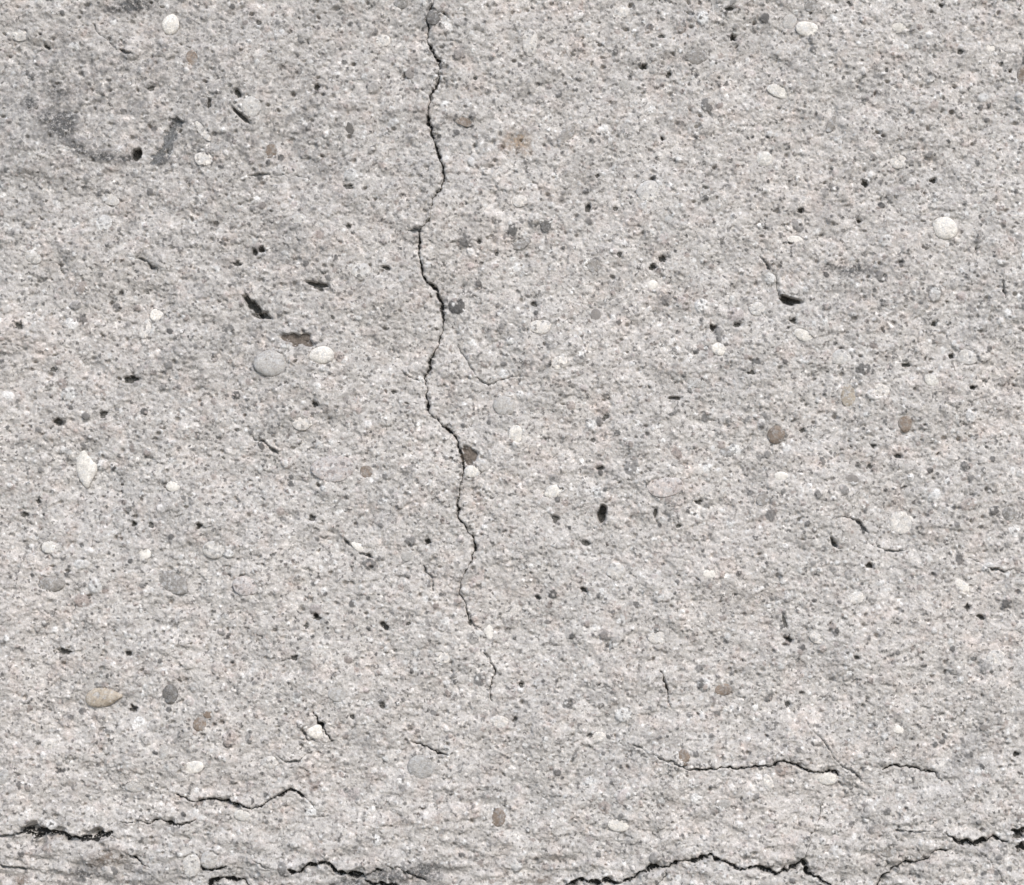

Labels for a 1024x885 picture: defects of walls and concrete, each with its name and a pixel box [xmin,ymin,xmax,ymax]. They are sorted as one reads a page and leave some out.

crack [401,2,516,701]
crack [635,723,939,779]
crack [0,788,322,842]
crack [202,860,426,885]
crack [567,805,831,885]
crack [876,829,1024,885]